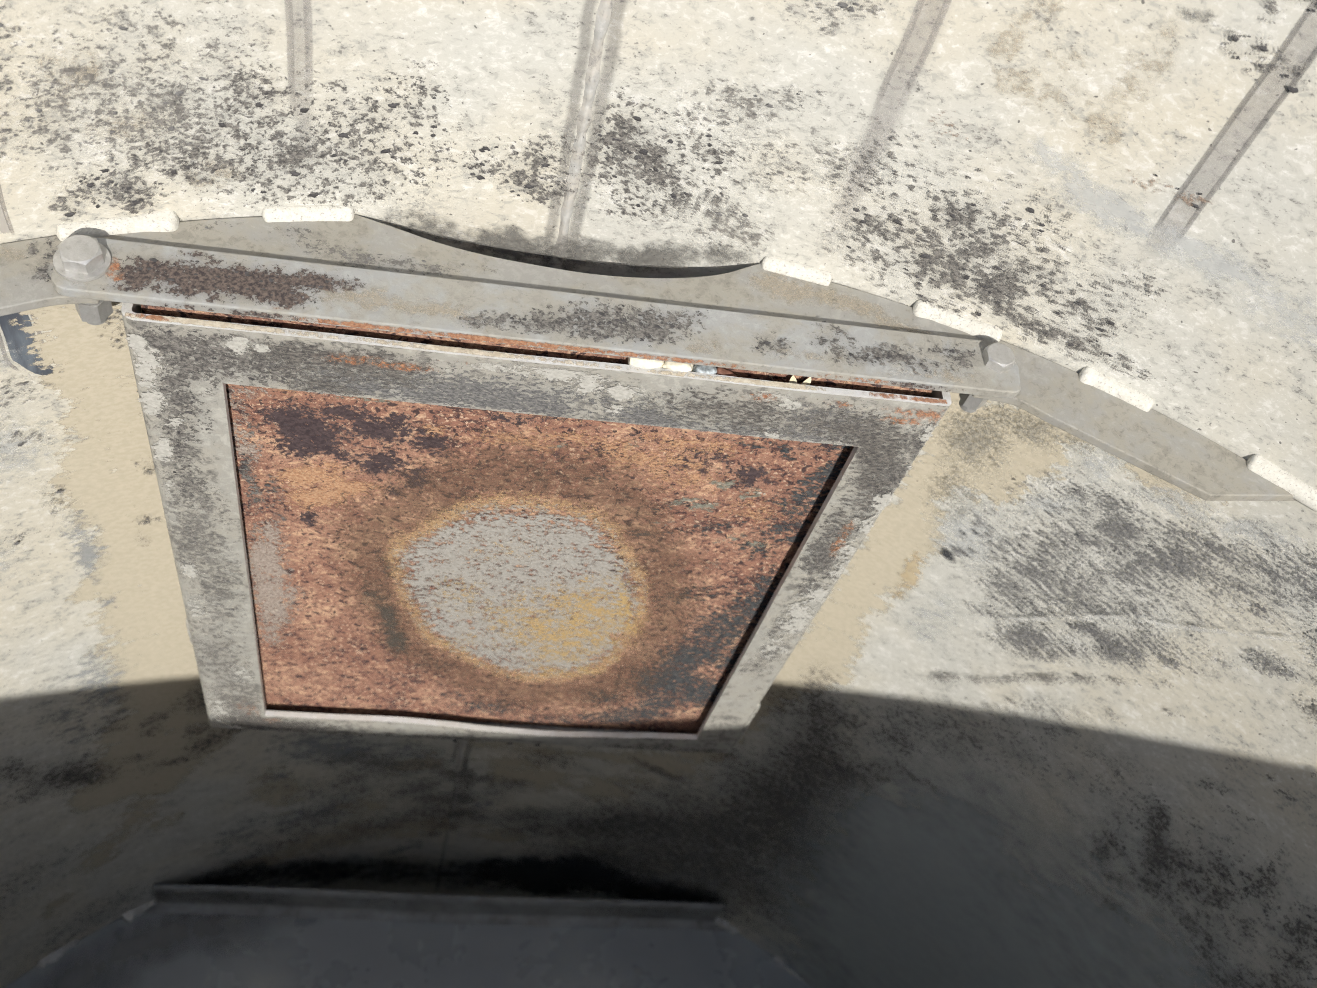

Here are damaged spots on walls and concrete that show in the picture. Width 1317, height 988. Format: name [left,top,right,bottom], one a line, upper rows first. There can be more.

corrosion [267,459,386,514]
corrosion [293,316,735,368]
corrosion [423,414,749,495]
damp [648,370,823,390]
damp [11,302,598,876]
corrosion [385,493,651,684]
damp [214,392,1201,886]
damp [784,790,1205,988]